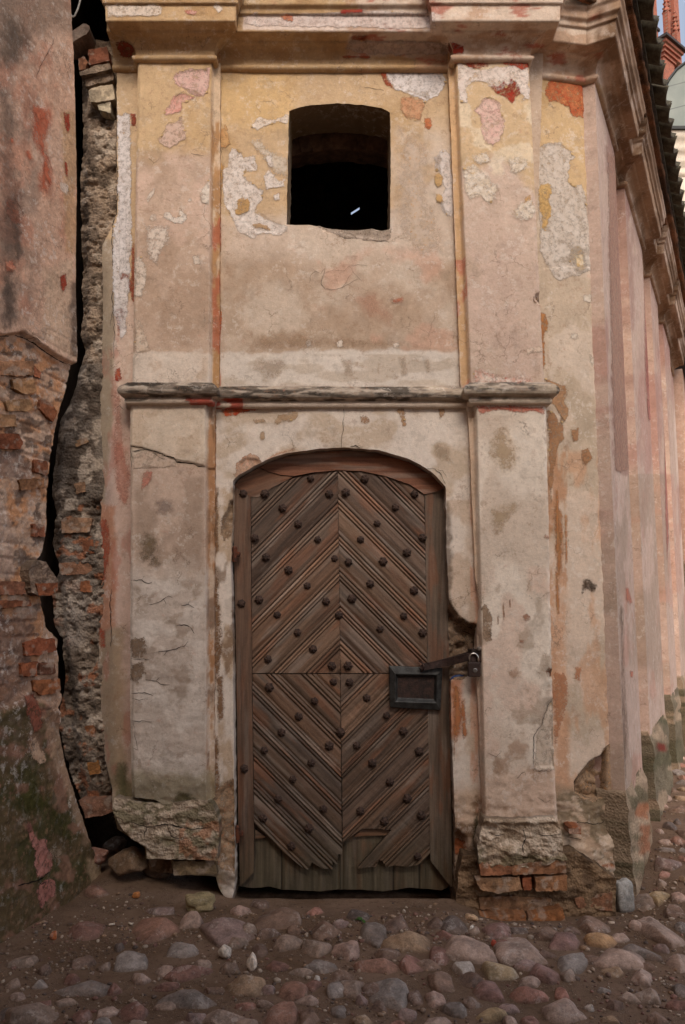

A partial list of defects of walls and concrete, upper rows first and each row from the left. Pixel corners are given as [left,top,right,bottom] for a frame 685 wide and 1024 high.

peeling [200,114,289,238]
peeling [381,42,530,216]
peeling [508,142,591,280]
flaking render [52,3,187,849]
crack [130,446,202,467]
peeling [473,291,592,504]
flaking render [447,599,493,680]
flaking render [574,745,612,802]